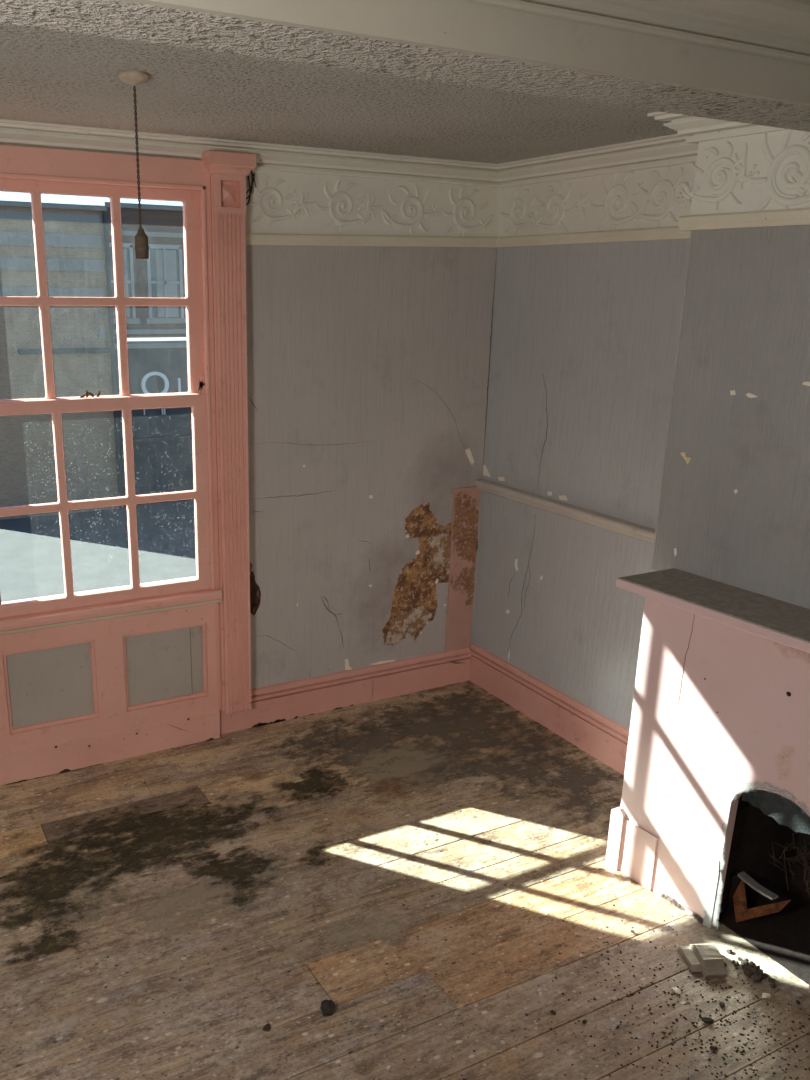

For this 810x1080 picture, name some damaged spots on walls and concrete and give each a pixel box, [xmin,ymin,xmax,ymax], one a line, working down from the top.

crack [409,251,497,474]
peeling [382,501,453,647]